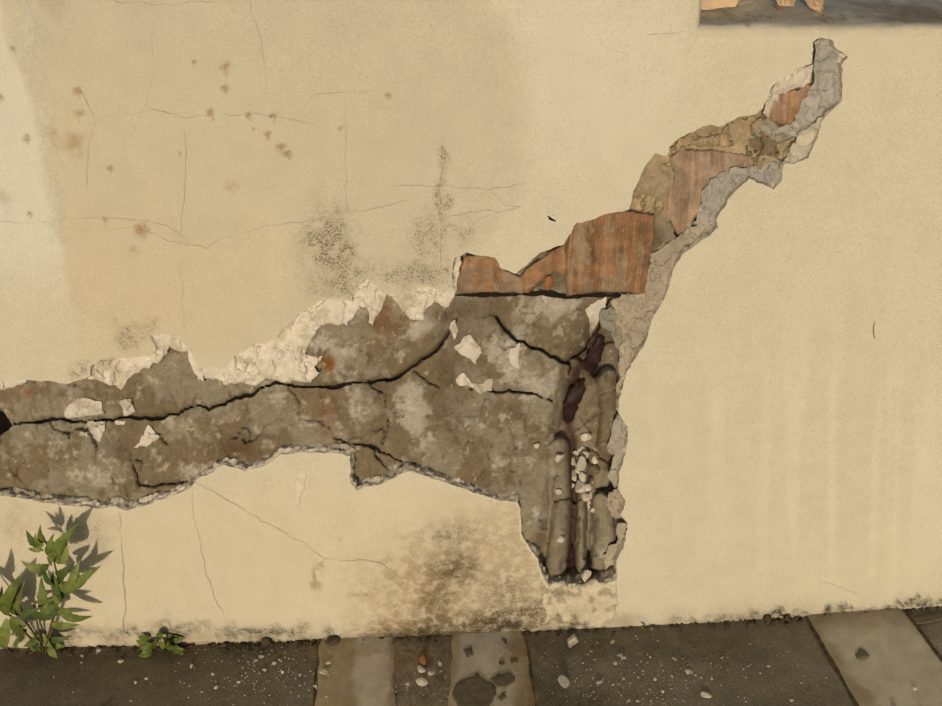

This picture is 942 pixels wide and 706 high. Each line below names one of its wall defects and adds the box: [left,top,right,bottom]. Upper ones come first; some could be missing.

crack [1,29,525,268]
spalling [0,38,848,628]
crack [470,389,551,401]
crack [456,291,621,374]
crack [118,506,126,640]
crack [133,464,400,617]
leakage [387,593,578,638]